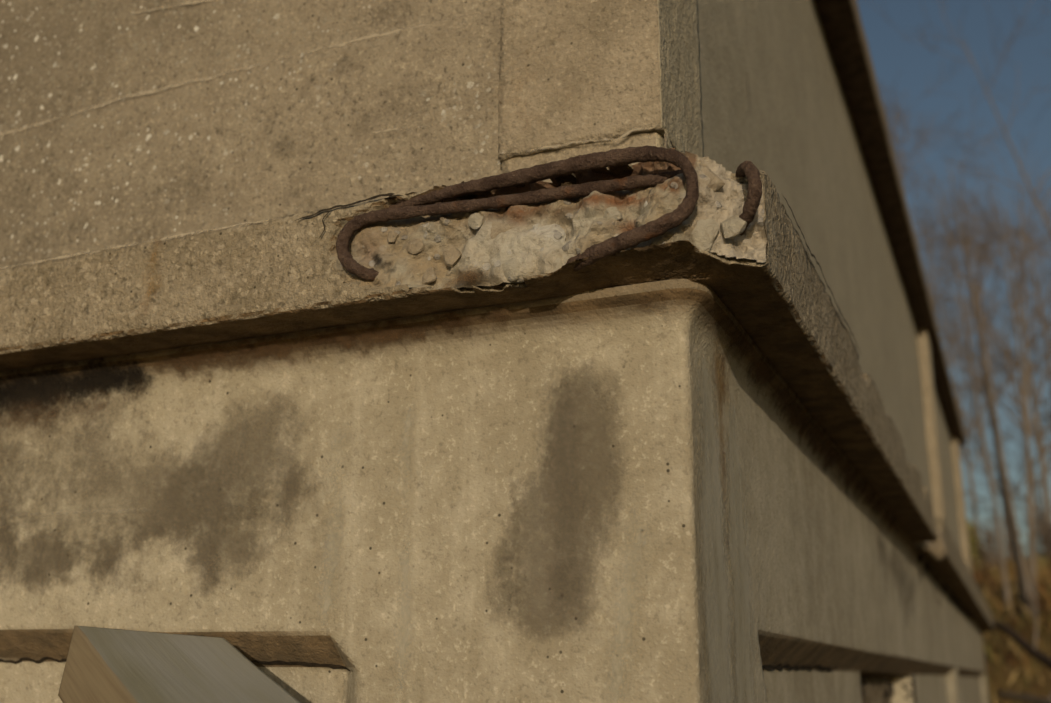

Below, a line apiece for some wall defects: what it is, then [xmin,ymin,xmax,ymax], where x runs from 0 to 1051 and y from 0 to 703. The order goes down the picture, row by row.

spalling [329,128,767,291]
leakage [158,321,423,370]
leakage [0,358,151,423]
spalling [914,527,947,561]